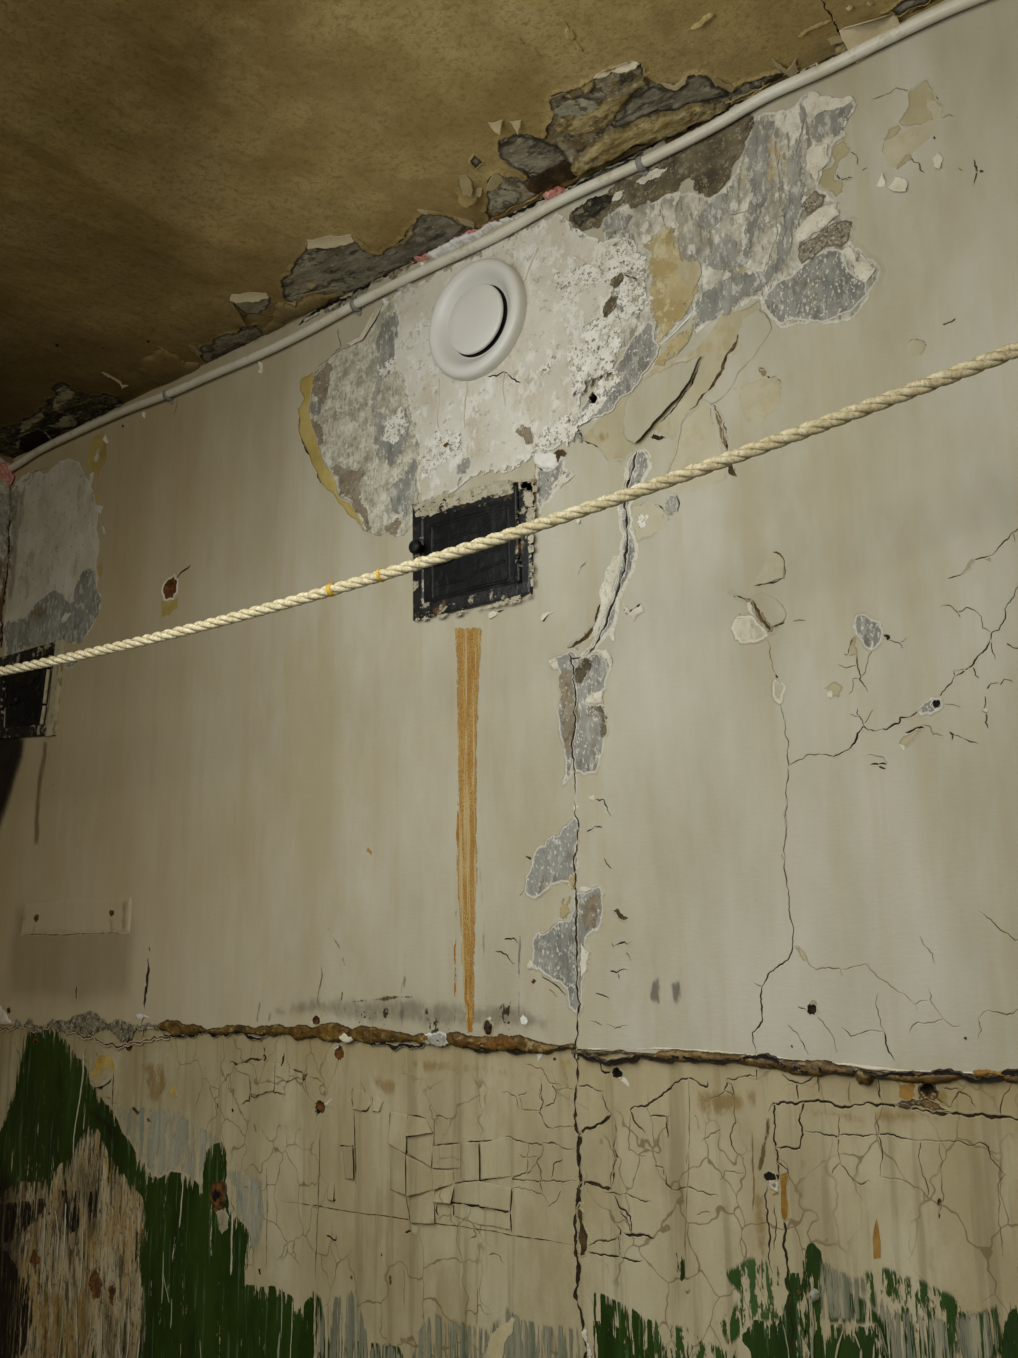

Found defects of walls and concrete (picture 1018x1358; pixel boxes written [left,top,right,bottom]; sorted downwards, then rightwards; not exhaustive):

flaking render [140,58,954,543]
flaking render [0,432,109,670]
peeling [727,550,806,646]
spalling [824,611,908,700]
rust [454,627,482,1033]
peeling [529,883,632,1031]
crack [495,428,1018,1358]
crack [228,1047,385,1114]
peeling [0,1028,403,1358]
crack [314,1131,322,1280]
peeling [388,1111,514,1240]
peeling [593,1243,1018,1358]